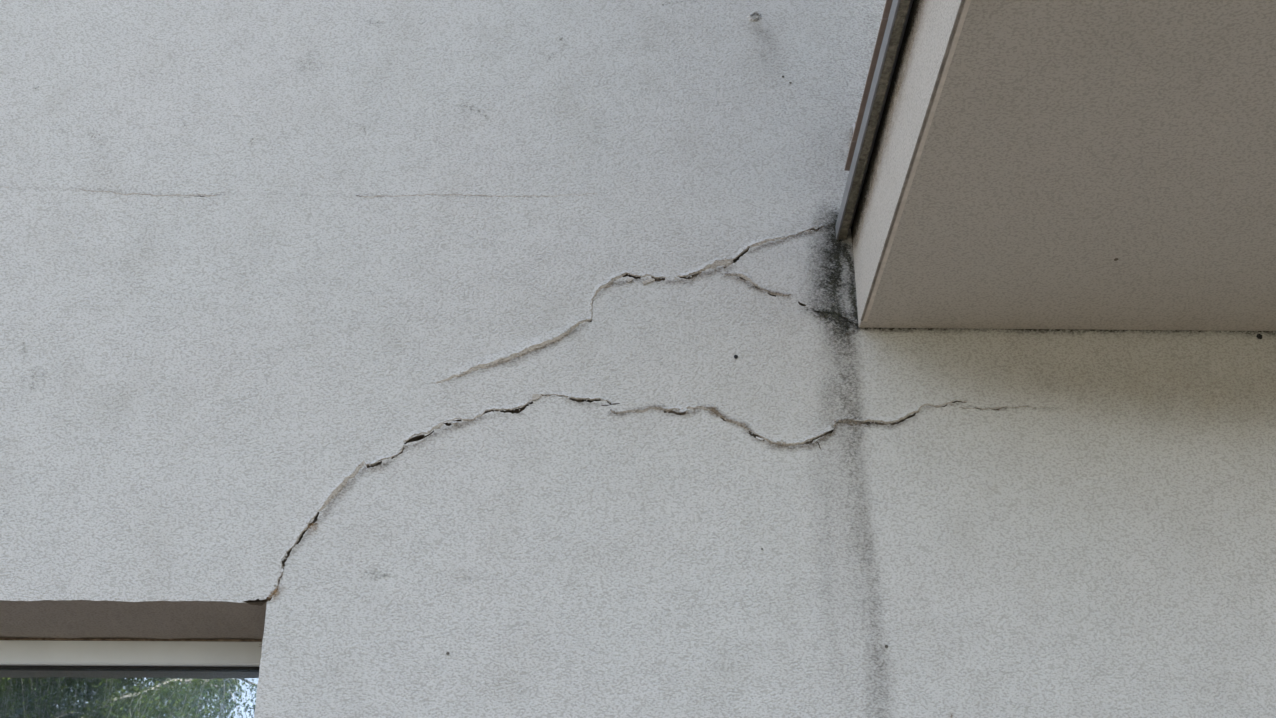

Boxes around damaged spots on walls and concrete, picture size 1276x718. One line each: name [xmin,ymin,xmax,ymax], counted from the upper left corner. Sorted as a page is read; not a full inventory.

crack [434,222,853,384]
water stain [807,215,861,442]
crack [243,391,1045,606]